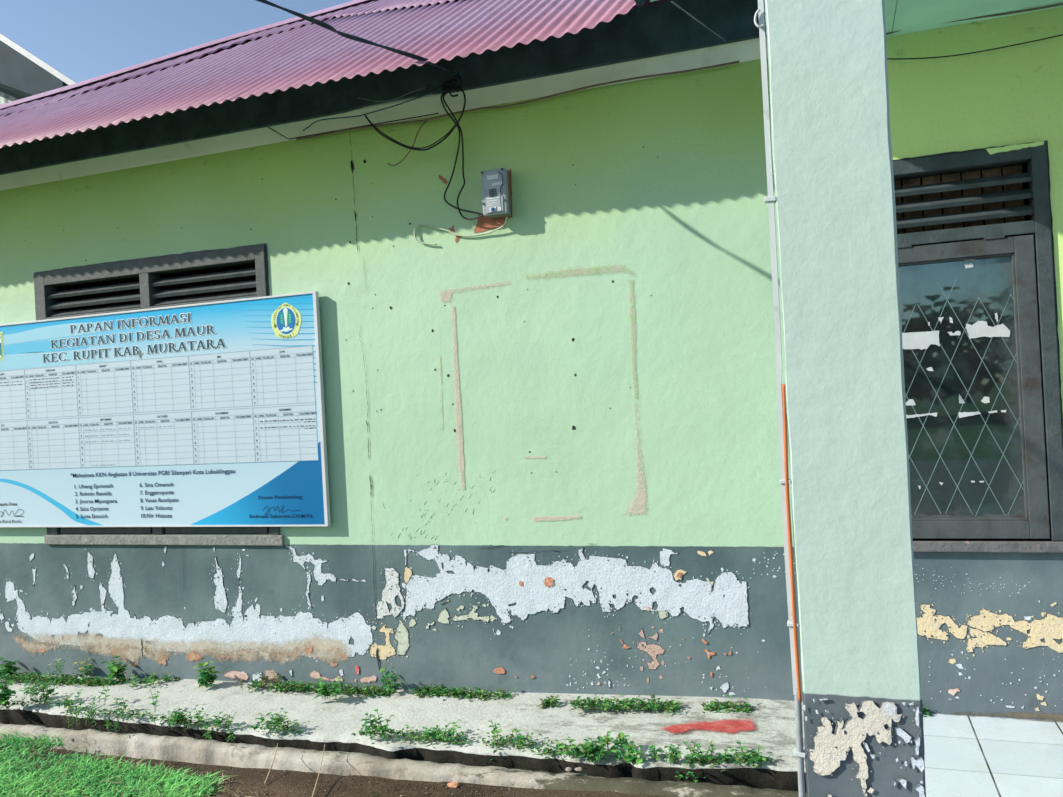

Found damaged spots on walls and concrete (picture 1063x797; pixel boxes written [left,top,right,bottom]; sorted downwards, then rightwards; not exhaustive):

crack [350,138,366,286]
peeling [0,544,784,696]
peeling [916,600,1063,711]
peeling [803,697,930,797]